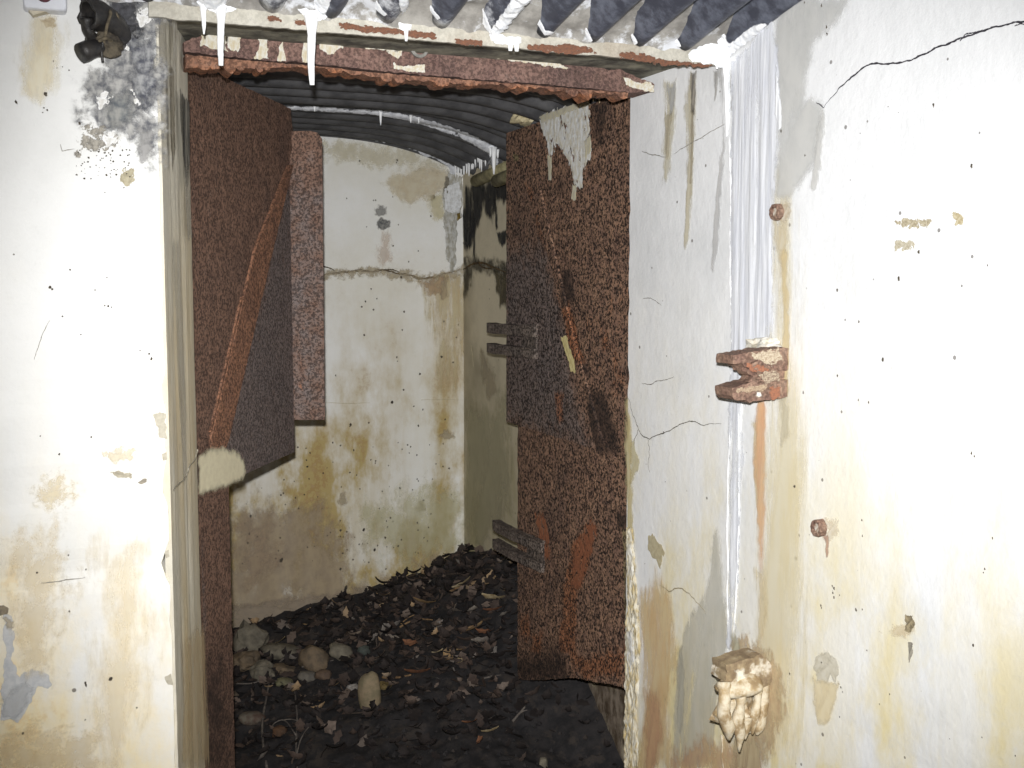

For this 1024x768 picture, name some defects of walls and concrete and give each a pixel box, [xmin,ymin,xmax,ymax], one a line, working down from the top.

corrosion [455,38,483,46]
damp [482,0,531,52]
corrosion [527,43,597,55]
crack [817,21,1024,108]
damp [74,0,192,239]
damp [539,98,600,201]
damp [664,0,846,351]
crack [323,258,507,296]
crack [627,377,719,472]
corrosion [746,360,781,545]
peeling [0,605,52,723]
damp [893,615,915,662]